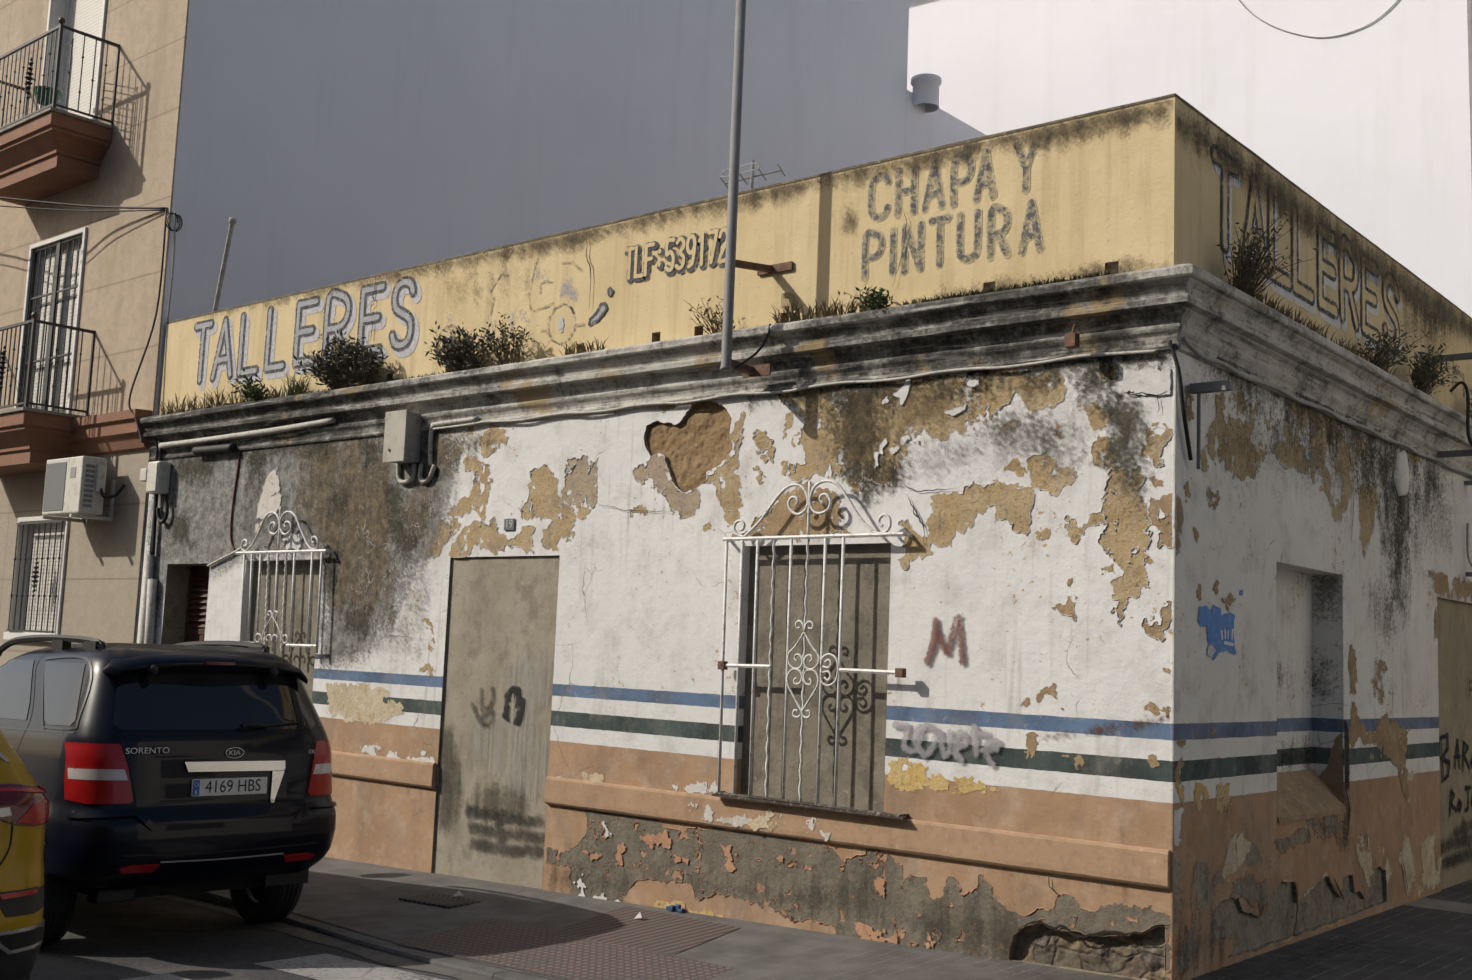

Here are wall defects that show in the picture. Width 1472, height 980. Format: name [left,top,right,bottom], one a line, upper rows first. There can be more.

leakage [212,97,1472,341]
leakage [147,430,493,670]
peeling [405,424,599,558]
peeling [629,504,648,517]
peeling [632,364,1379,642]
leakage [1209,356,1441,637]
flaking render [545,644,1441,980]